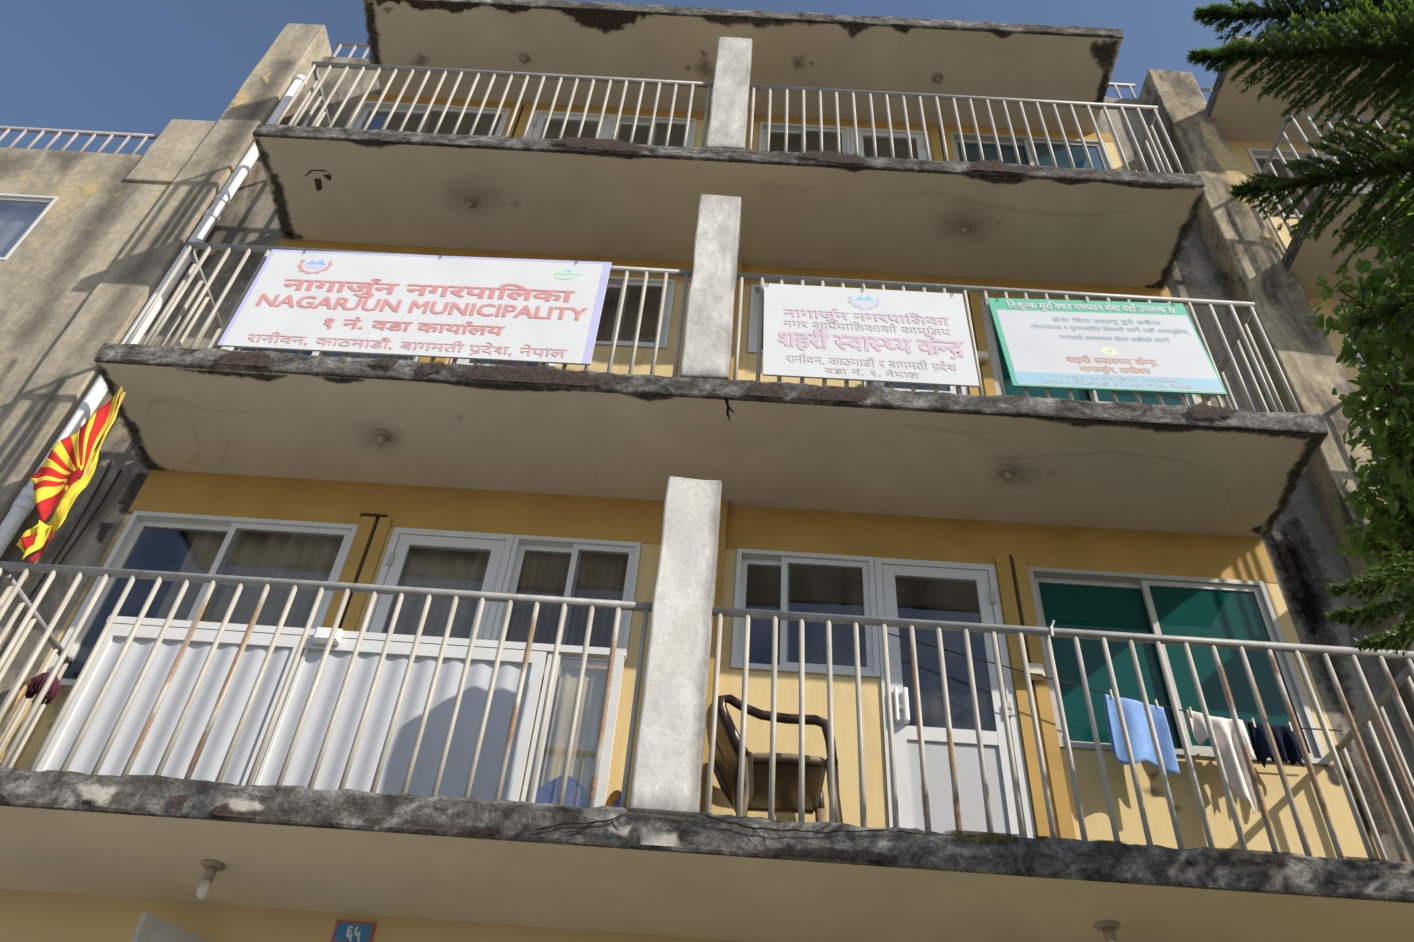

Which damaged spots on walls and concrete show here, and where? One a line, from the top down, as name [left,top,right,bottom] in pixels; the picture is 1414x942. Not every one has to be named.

peeling [390,0,652,34]
peeling [1090,41,1118,103]
leakage [186,369,286,381]
leakage [416,380,570,392]
crack [725,397,734,421]
leakage [97,364,177,543]
leakage [995,413,1355,726]
rust [217,606,259,701]
rust [189,735,204,766]
spalling [78,784,116,805]
spalling [211,798,264,818]
crack [536,809,633,834]